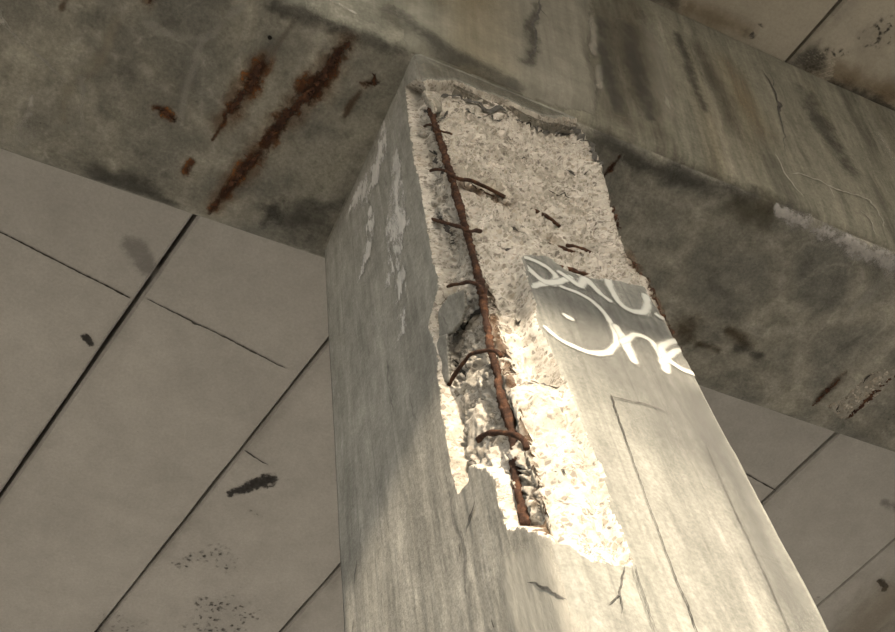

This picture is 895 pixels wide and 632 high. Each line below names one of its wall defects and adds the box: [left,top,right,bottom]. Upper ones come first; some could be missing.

crack [526,0,546,65]
corrosion [208,31,351,215]
peeling [390,148,410,241]
water stain [597,132,895,275]
peeling [358,206,375,282]
peeling [397,268,406,300]
spalling [405,78,669,567]
corrosion [812,378,840,406]
spalling [827,368,895,419]